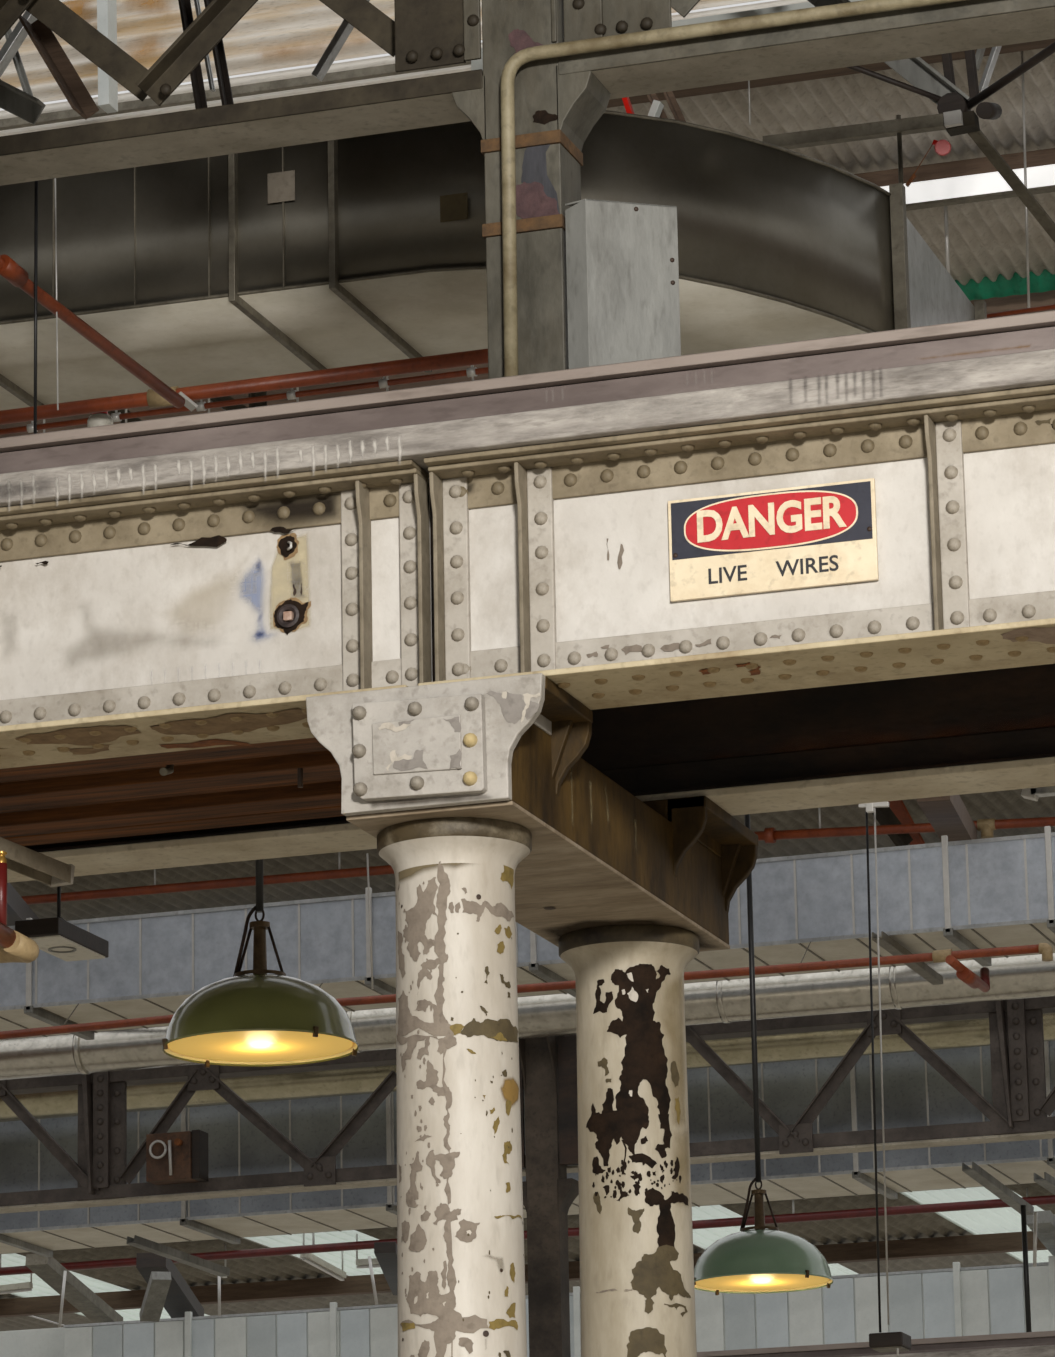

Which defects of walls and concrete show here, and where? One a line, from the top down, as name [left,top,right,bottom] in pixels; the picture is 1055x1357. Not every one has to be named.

peeling [486,691,541,724]
peeling [444,717,461,732]
peeling [386,750,427,771]
peeling [449,749,462,769]
peeling [397,861,524,1357]
peeling [586,964,691,1357]